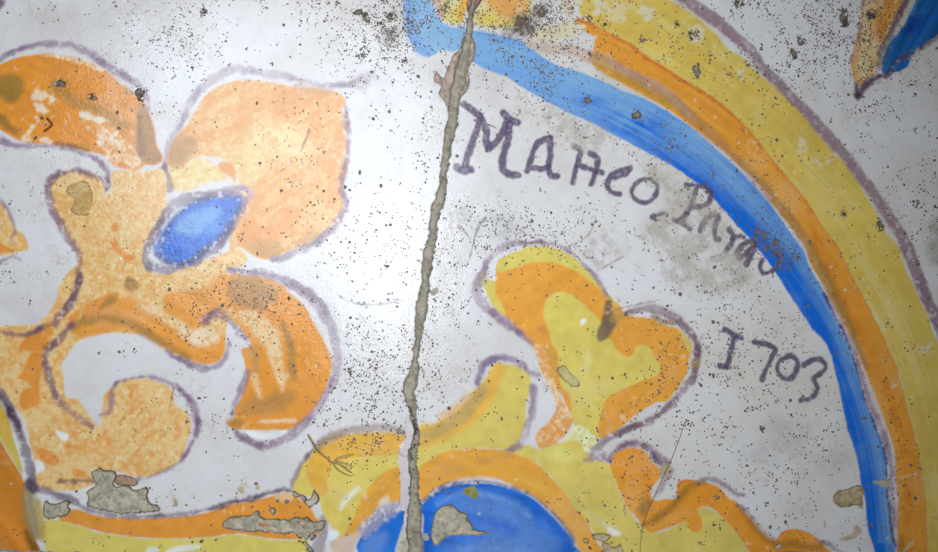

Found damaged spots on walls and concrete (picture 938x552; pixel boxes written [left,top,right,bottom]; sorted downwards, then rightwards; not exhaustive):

crack [403,0,476,552]